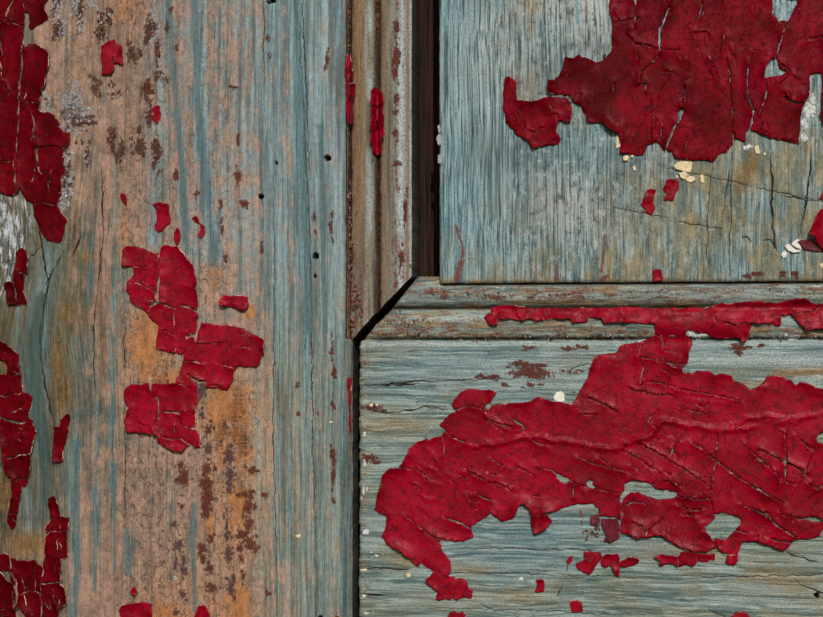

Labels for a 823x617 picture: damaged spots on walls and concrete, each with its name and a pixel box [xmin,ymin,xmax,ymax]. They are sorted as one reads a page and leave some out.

peeling [0,0,91,243]
peeling [345,40,356,125]
peeling [502,0,823,214]
crack [613,153,820,273]
peeling [781,192,823,258]
peeling [121,202,265,451]
peeling [0,340,37,530]
peeling [52,414,71,463]
peeling [374,288,823,601]
peeling [0,495,69,617]
peeling [570,600,583,613]
crack [428,547,823,617]